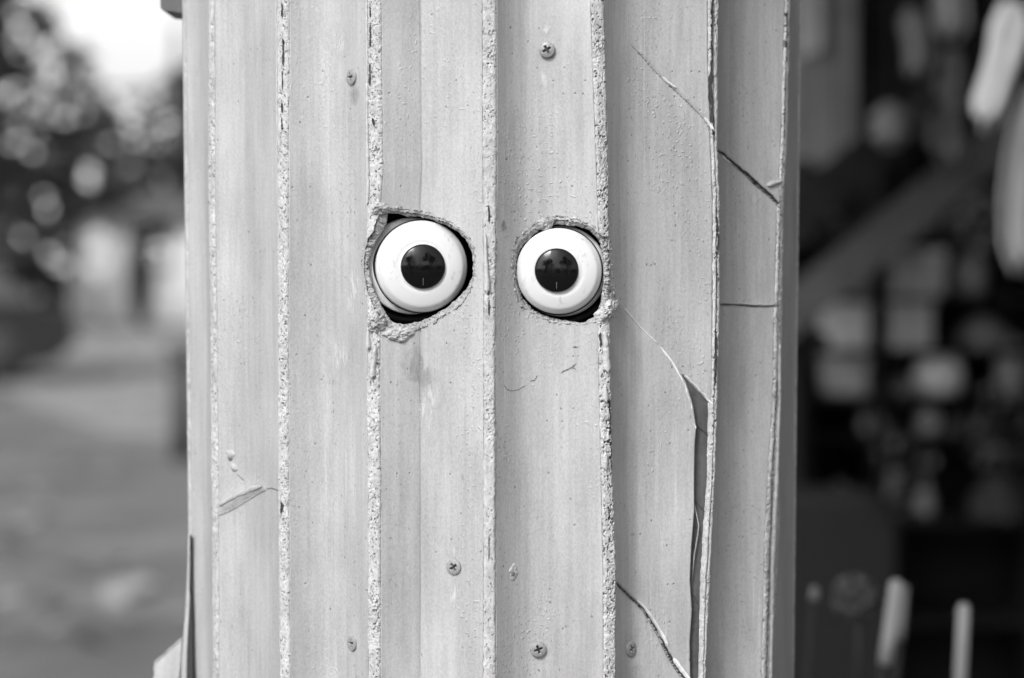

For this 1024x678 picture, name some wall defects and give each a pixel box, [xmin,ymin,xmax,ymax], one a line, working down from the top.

crack [631,0,783,203]
crack [714,207,778,391]
crack [617,583,690,678]